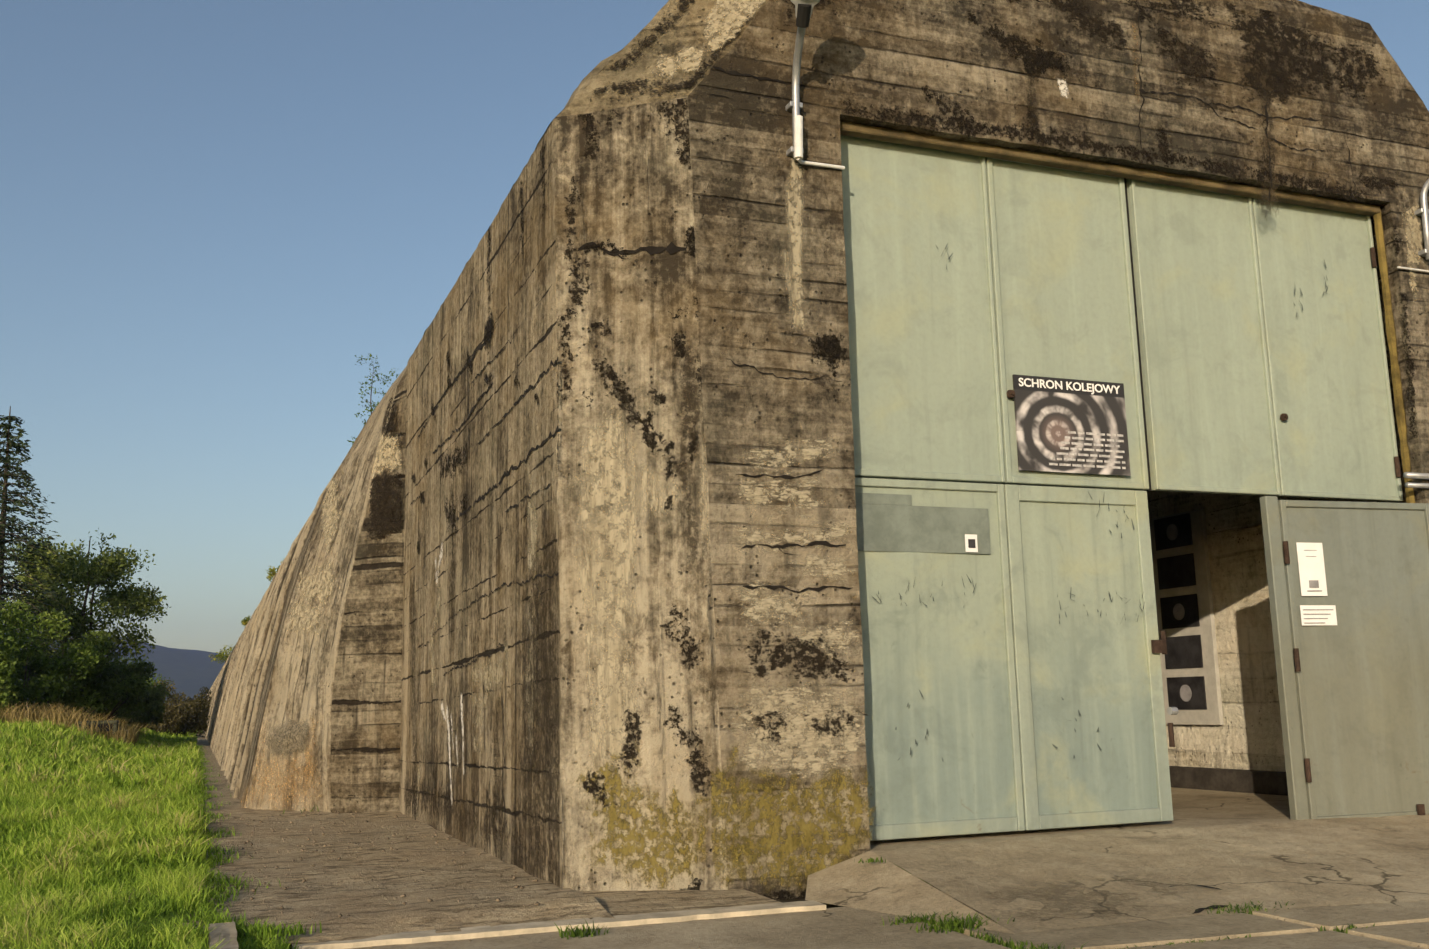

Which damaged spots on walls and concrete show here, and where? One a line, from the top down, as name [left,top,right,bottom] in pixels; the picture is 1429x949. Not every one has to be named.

crack [578,227,694,259]
spalling [366,396,428,540]
leakage [734,438,859,658]
leakage [732,682,861,779]
crack [1170,884,1228,914]